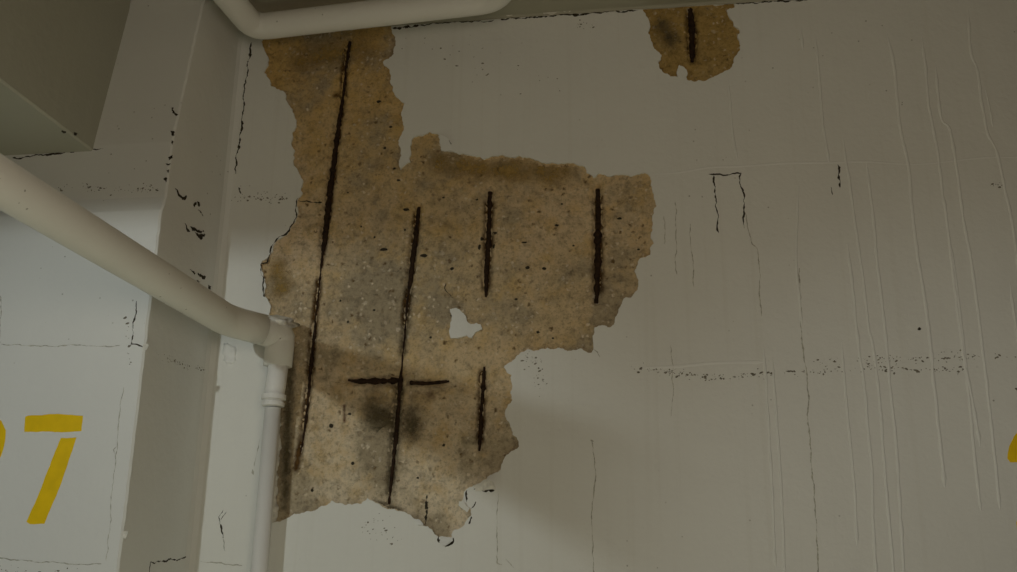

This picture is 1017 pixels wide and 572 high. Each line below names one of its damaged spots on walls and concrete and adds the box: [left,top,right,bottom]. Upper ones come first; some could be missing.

crack [234,42,252,193]
spalling [643,4,740,82]
corrosion [293,279,321,471]
corrosion [401,288,412,325]
spalling [262,26,656,546]
crack [709,172,762,316]
crack [798,268,819,572]